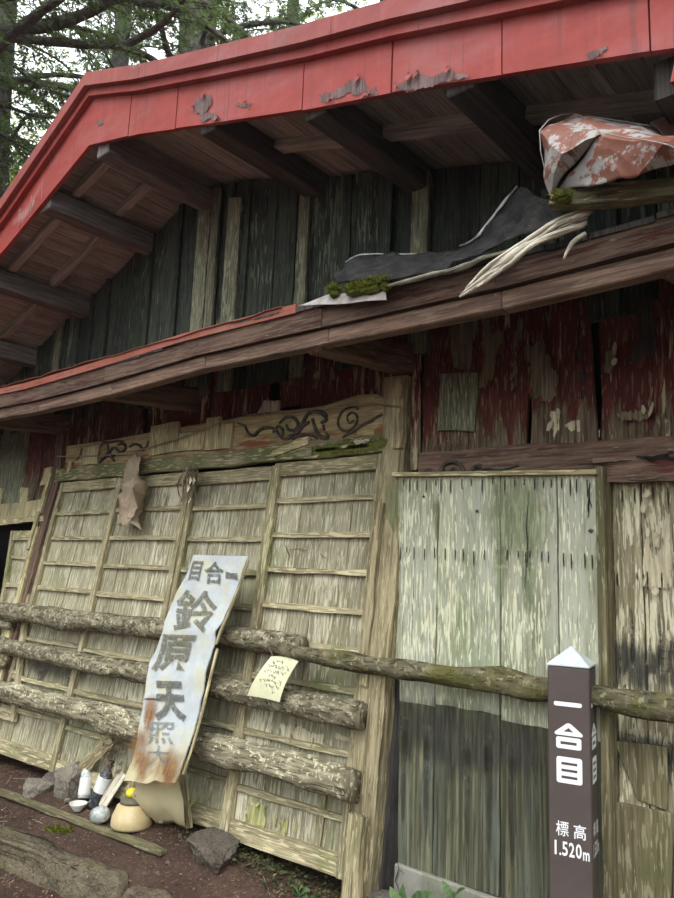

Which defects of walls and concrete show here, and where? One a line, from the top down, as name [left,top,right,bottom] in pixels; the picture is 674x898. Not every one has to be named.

peeling [320,74,378,104]
peeling [394,66,470,92]
peeling [190,93,220,123]
peeling [447,319,504,389]
peeling [604,342,617,374]
peeling [523,339,580,438]
peeling [617,402,654,424]